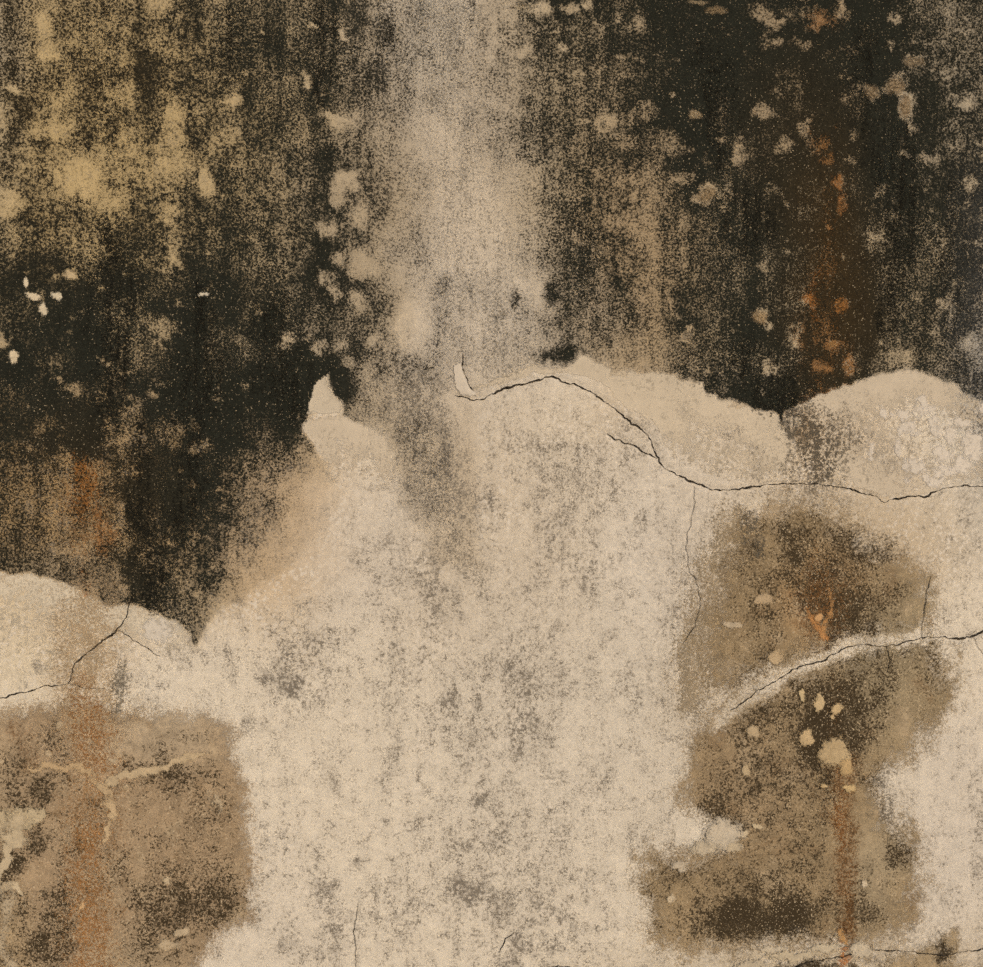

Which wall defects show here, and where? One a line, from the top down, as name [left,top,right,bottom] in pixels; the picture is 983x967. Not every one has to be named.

rust [805,9,837,32]
rust [798,131,855,403]
damp [0,0,983,750]
crack [455,355,983,640]
crack [0,596,159,699]
rust [806,588,833,640]
crack [732,578,983,710]
damp [0,807,46,967]
damp [27,751,205,843]
rust [831,755,859,967]
crack [796,948,983,967]